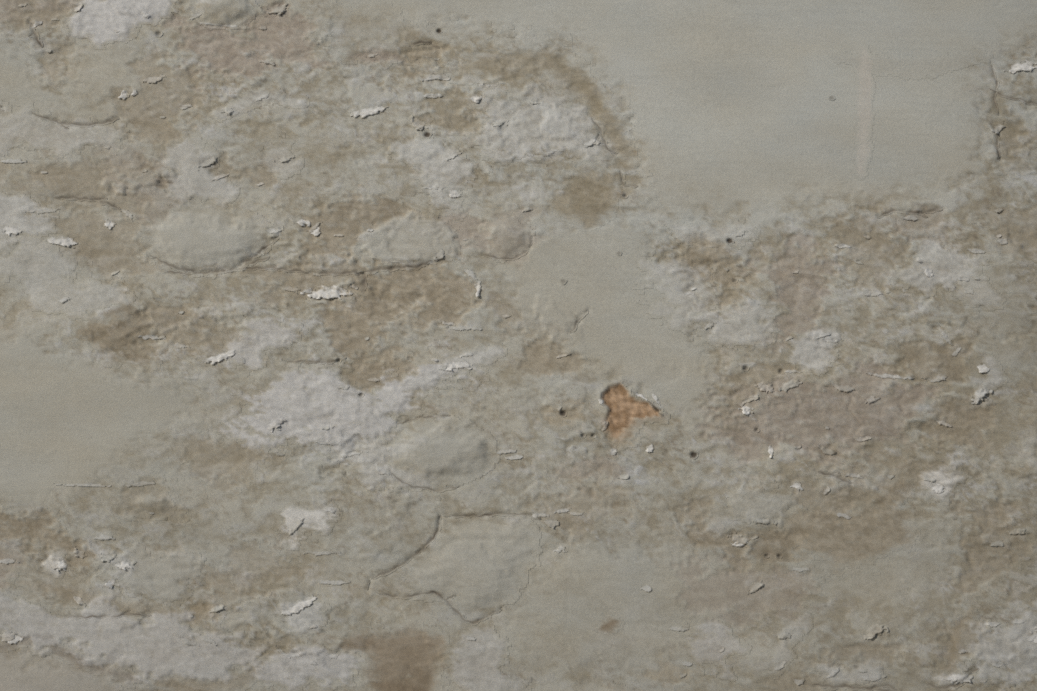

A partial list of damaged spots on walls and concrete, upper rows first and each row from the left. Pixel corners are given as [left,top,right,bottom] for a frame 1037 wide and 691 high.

peeling [1003,41,1037,74]
peeling [0,0,345,289]
peeling [409,76,489,142]
peeling [986,116,1037,176]
peeling [237,184,670,553]
peeling [662,187,1000,520]
crack [397,414,451,424]
peeling [0,503,106,608]
crack [365,472,541,625]
peeling [669,491,783,571]
peeling [240,621,309,658]
peeling [799,622,922,673]